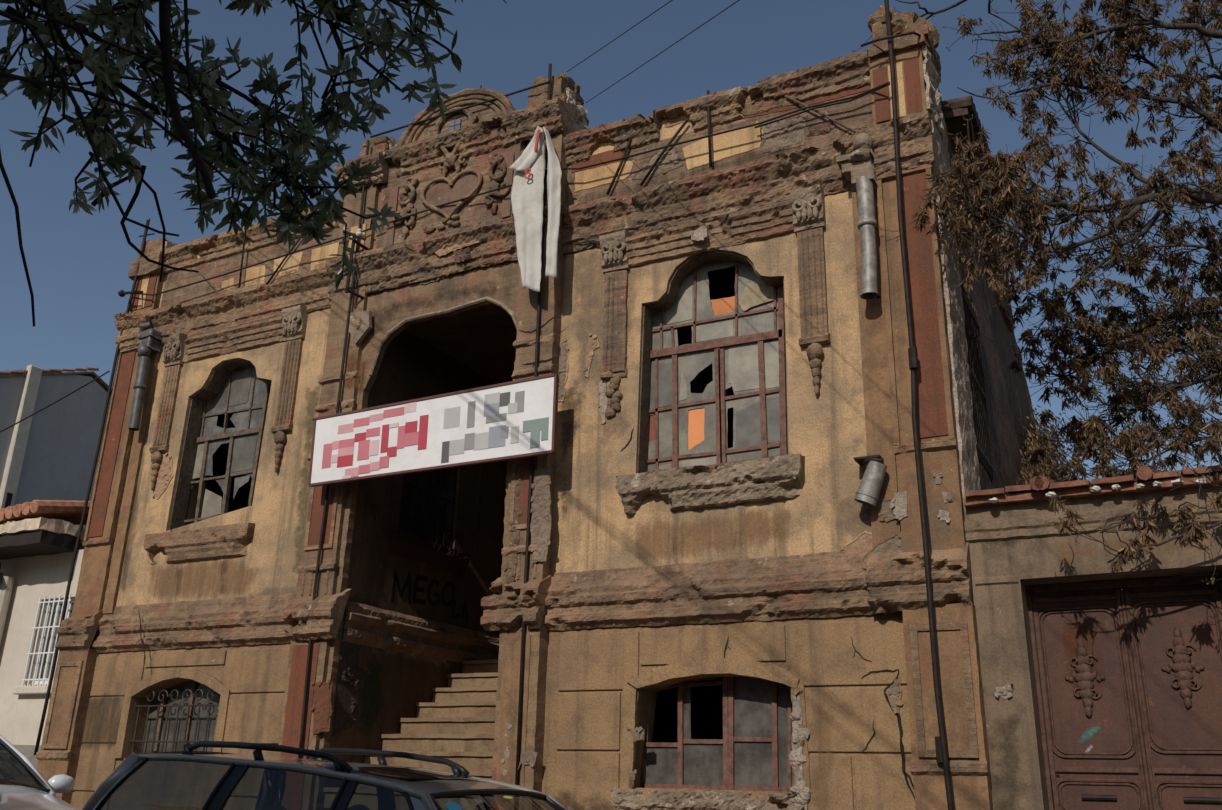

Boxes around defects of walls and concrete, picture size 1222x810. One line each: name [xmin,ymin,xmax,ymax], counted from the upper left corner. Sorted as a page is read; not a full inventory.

spalling [627,726,645,742]
crack [851,637,915,800]